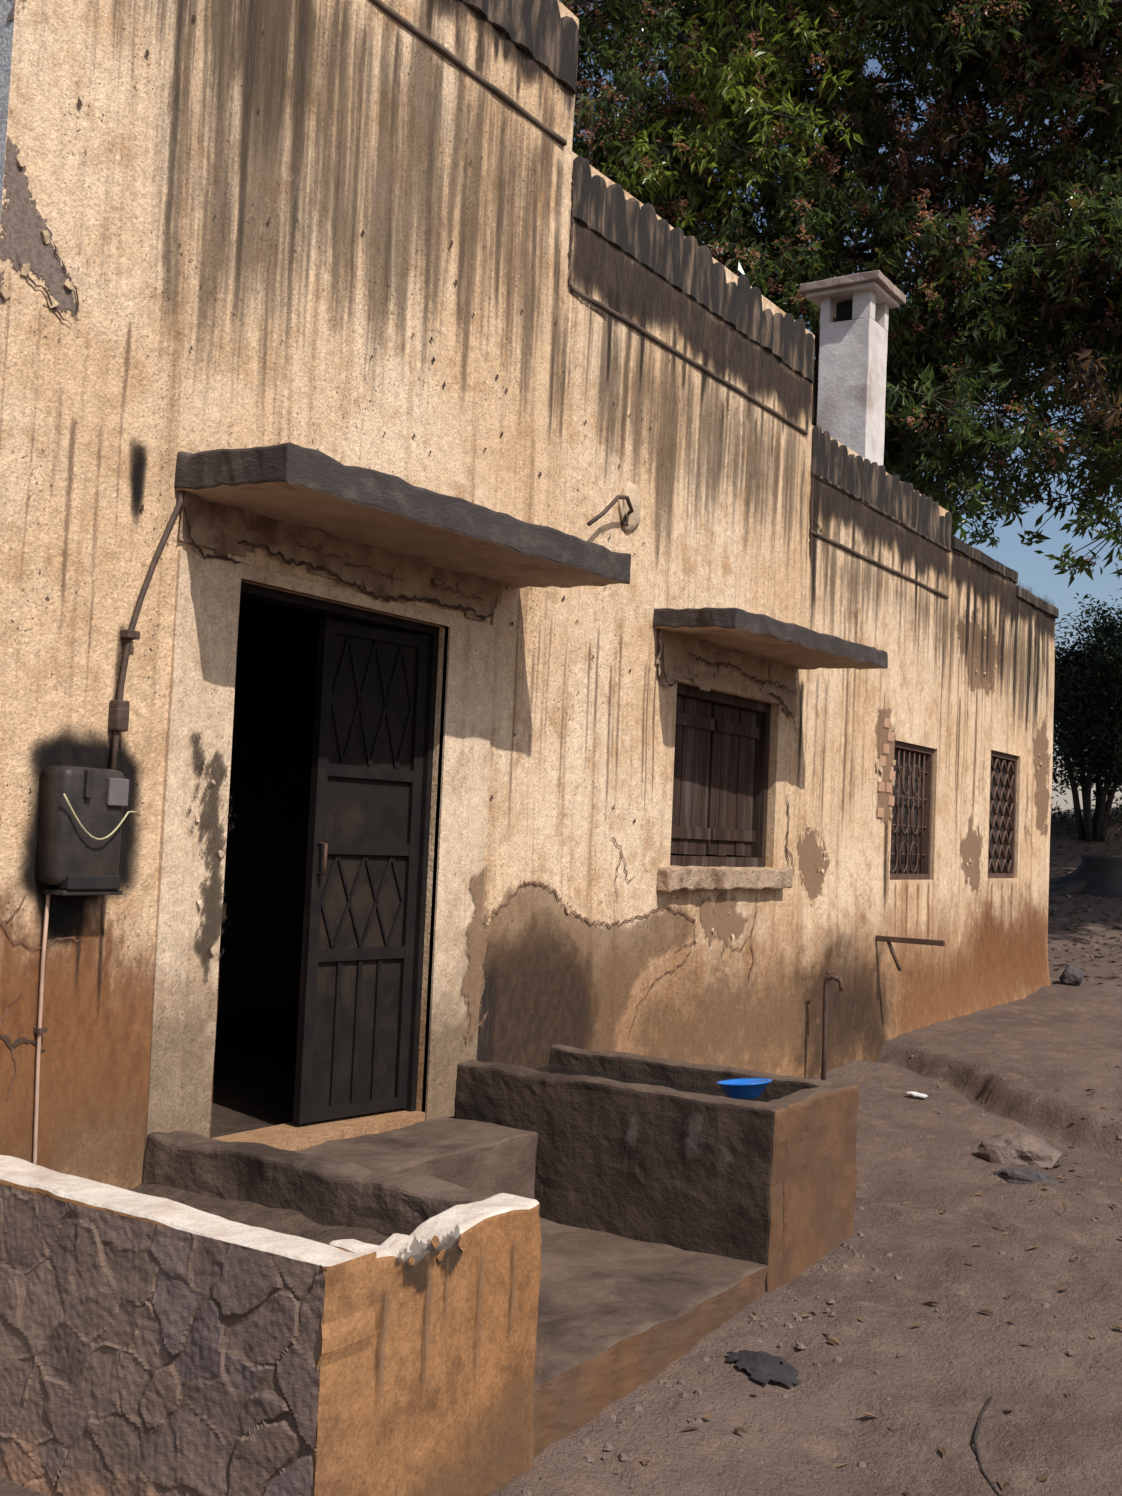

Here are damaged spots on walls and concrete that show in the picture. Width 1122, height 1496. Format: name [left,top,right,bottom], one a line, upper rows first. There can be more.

damp [165,0,196,302]
peeling [0,135,79,325]
damp [63,422,76,592]
damp [131,444,146,516]
spalling [179,492,508,622]
damp [200,0,1055,829]
peeling [876,706,896,826]
peeling [797,827,830,906]
peeling [960,816,983,893]
damp [477,934,592,1069]
damp [481,879,698,1038]
spalling [396,1226,466,1293]